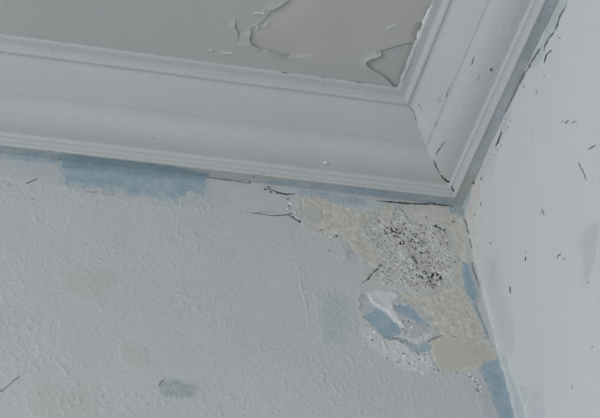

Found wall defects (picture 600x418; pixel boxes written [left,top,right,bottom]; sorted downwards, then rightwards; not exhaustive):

peeling [0,145,212,214]
crack [247,212,298,221]
flaking render [261,0,569,378]
crack [382,142,454,225]
leakage [157,377,202,403]